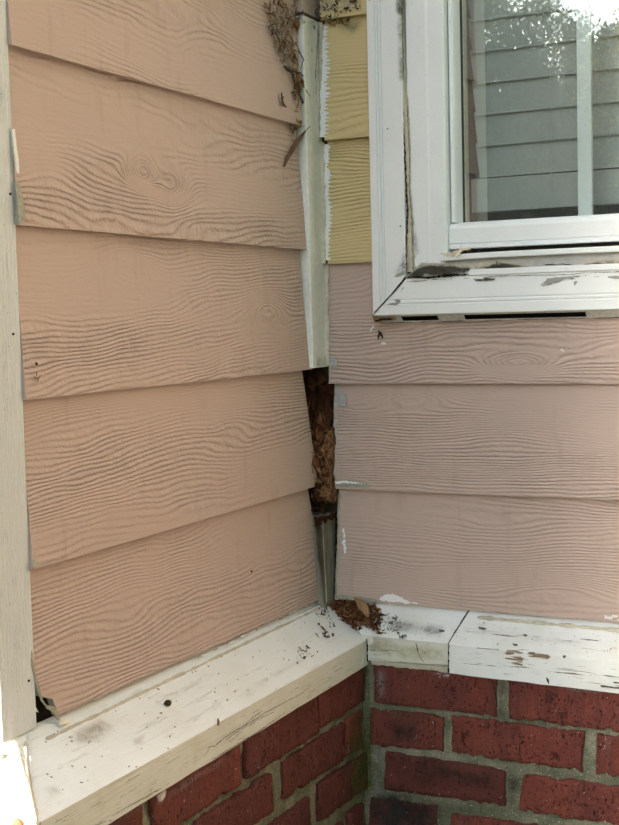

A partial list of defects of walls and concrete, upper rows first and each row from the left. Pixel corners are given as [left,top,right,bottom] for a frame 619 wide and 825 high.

peeling [308,400,329,515]
peeling [478,626,550,675]
peeling [551,668,619,689]